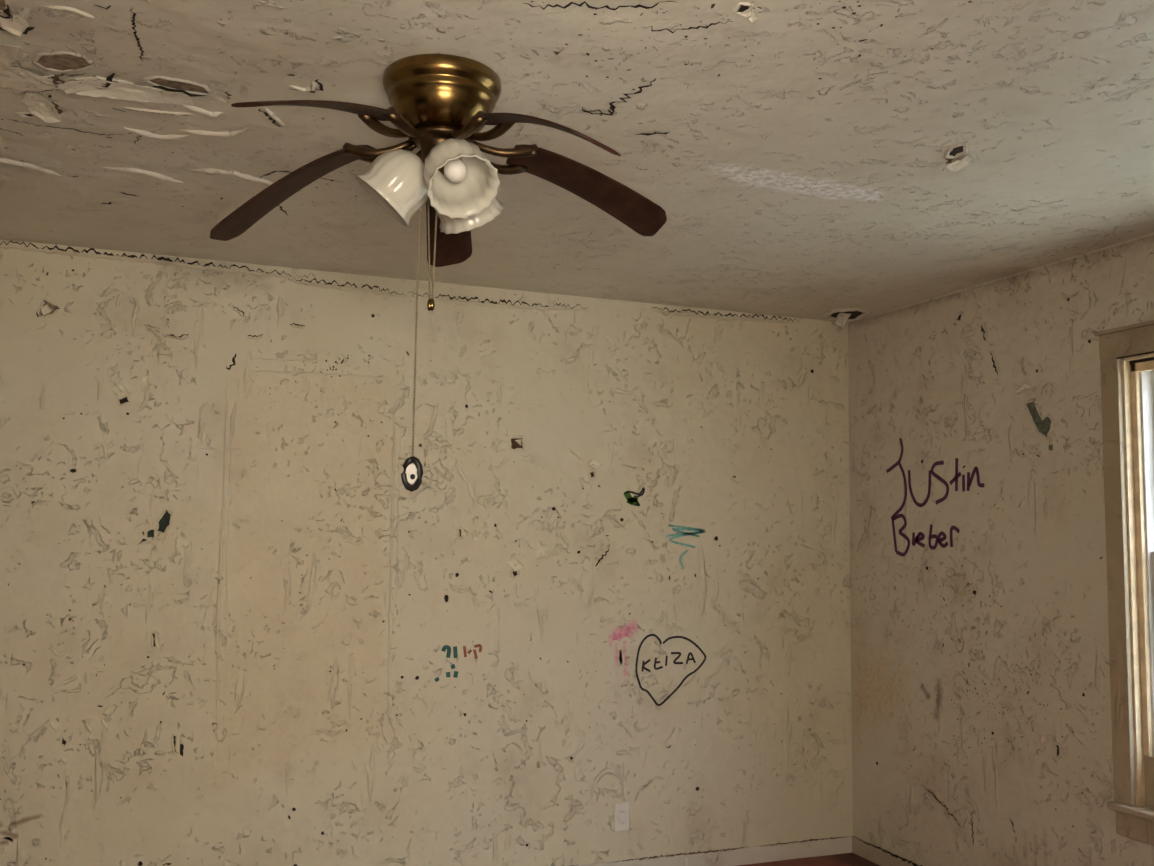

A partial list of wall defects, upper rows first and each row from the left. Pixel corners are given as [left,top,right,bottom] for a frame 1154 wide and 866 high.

peeling [0,0,233,123]